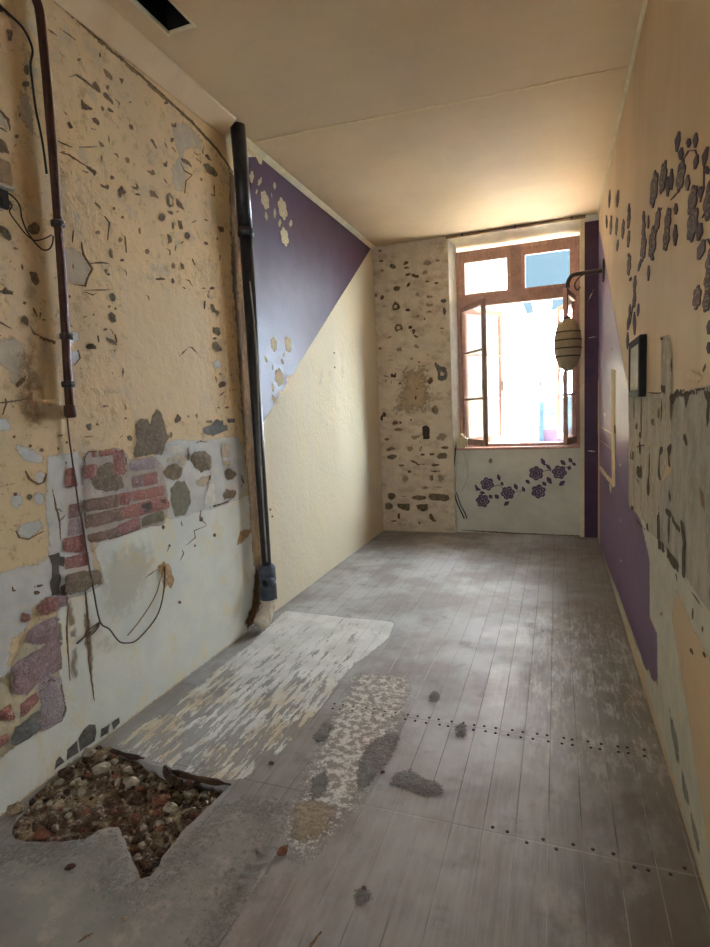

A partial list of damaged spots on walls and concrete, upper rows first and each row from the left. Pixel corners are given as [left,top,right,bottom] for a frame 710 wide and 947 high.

peeling [0,3,36,154]
spalling [81,69,131,130]
spalling [375,250,446,363]
damp [18,353,40,423]
spalling [380,412,412,459]
flaking render [408,434,448,459]
flaking render [385,475,449,524]
spalling [237,529,251,545]
peeling [598,335,710,904]
peeling [117,611,394,780]